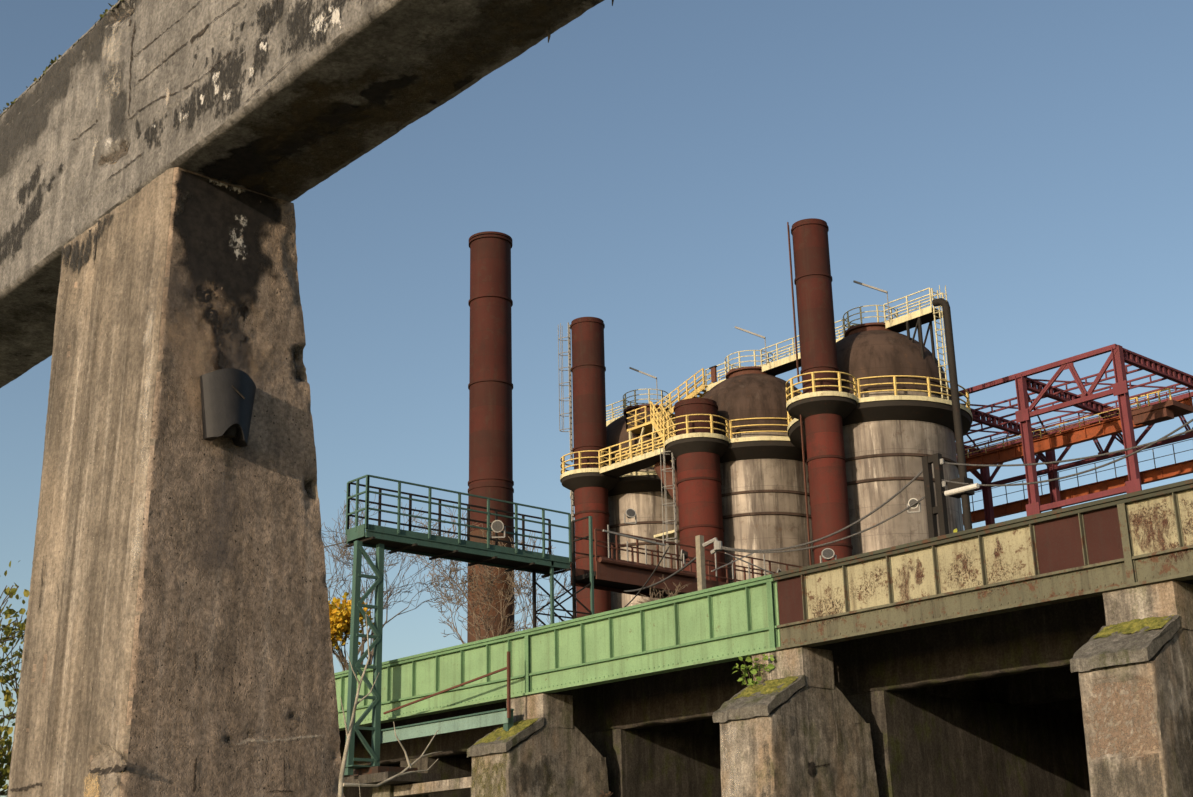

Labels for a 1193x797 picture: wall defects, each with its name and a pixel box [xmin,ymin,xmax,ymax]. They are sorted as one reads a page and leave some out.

damp [0,0,138,176]
damp [231,215,247,259]
damp [196,288,243,370]
rust [1129,499,1193,561]
rust [852,560,924,610]
rust [944,539,1025,594]
crack [191,758,199,792]
crack [266,755,293,792]